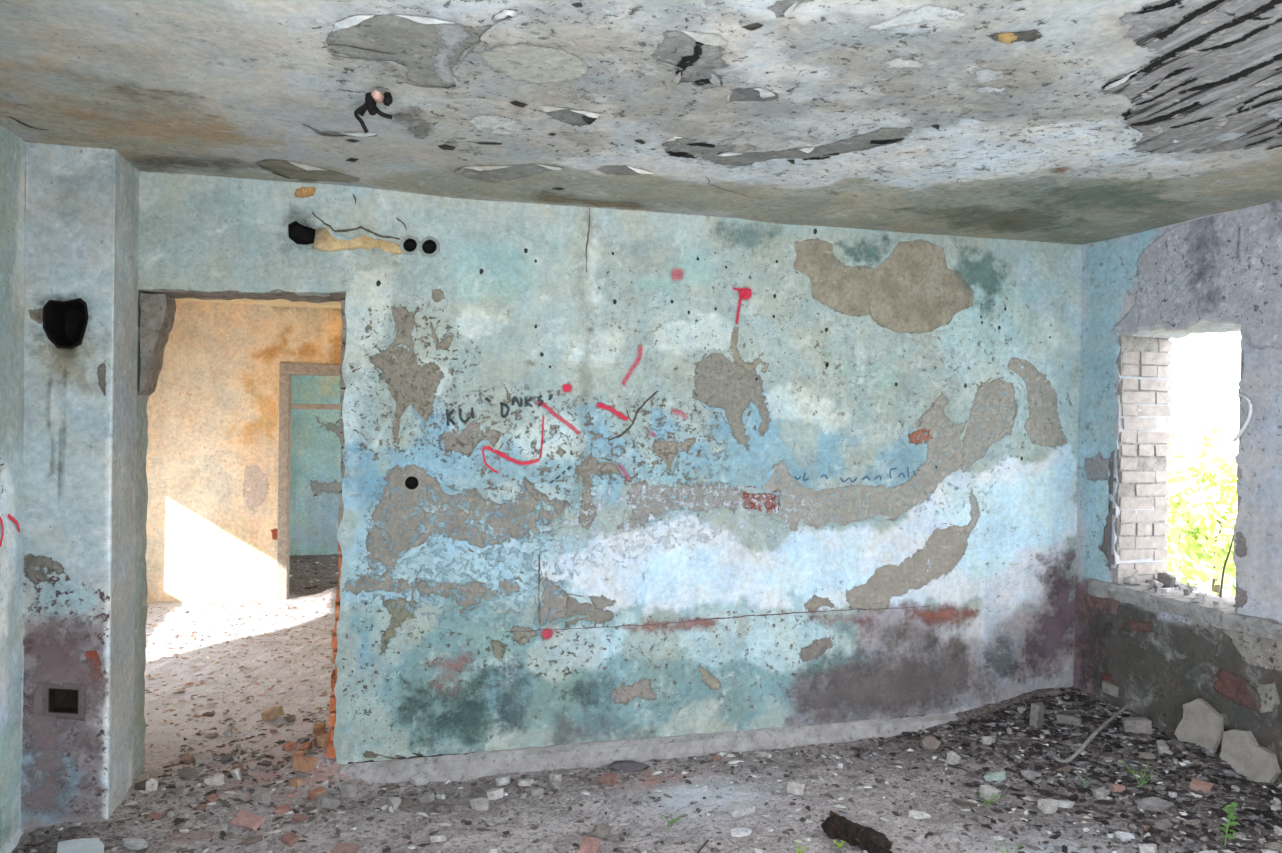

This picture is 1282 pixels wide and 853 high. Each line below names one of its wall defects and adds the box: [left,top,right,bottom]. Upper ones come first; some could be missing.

spalling [296,0,1282,212]
spalling [310,228,1072,761]
water stain [22,623,109,813]
water stain [787,551,1105,723]
flaking render [1082,593,1282,751]